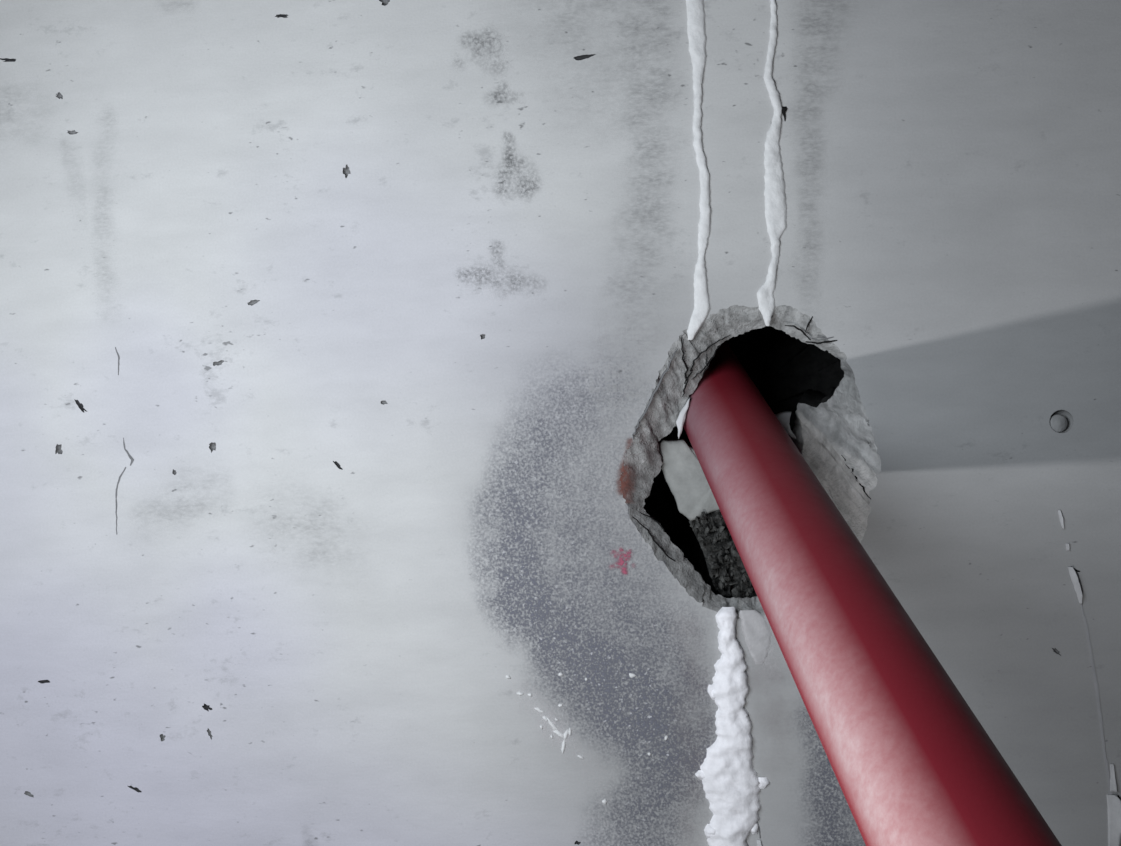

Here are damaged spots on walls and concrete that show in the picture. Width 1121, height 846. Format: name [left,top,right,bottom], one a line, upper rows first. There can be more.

leakage [686,0,711,340]
leakage [757,0,787,326]
leakage [482,403,772,846]
spalling [620,305,881,619]
crack [1058,510,1121,846]